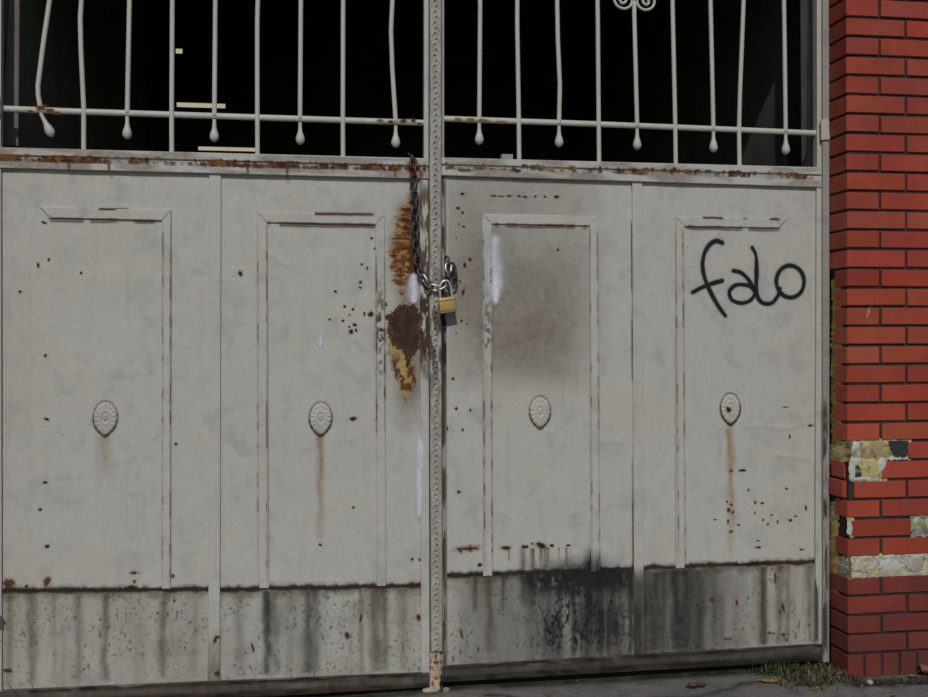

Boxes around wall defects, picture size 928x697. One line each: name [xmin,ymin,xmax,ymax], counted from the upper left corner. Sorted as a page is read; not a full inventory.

corrosion [0,149,426,175]
corrosion [445,162,757,176]
corrosion [768,167,814,181]
corrosion [328,189,429,396]
corrosion [442,313,457,363]
spalling [829,501,928,600]
leakage [521,555,716,659]